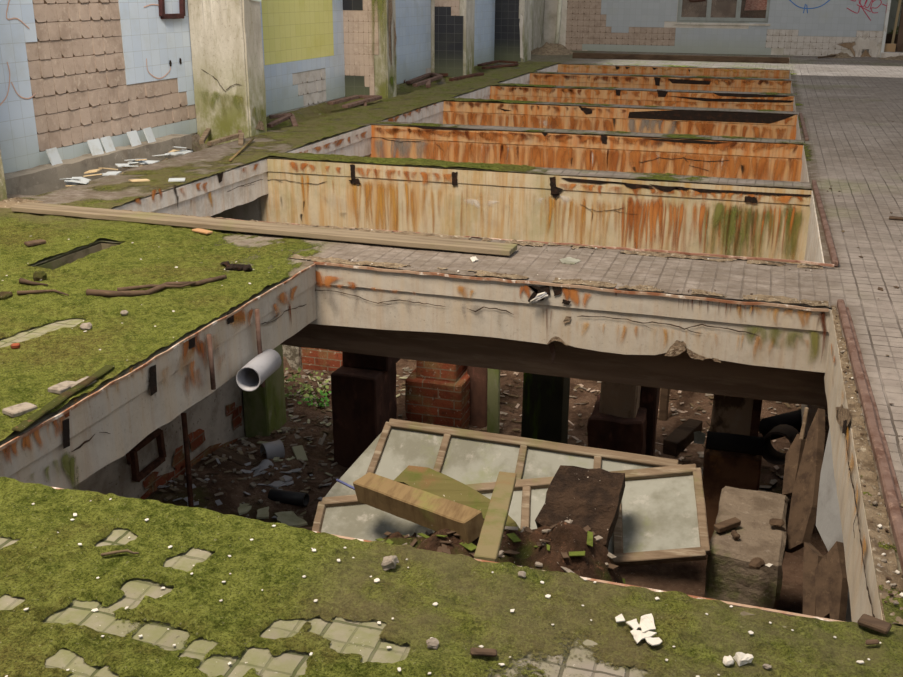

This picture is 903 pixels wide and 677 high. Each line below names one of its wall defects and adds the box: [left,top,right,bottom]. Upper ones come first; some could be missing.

peeling [565,0,676,50]
peeling [765,29,883,57]
peeling [25,0,196,152]
rust [377,65,797,181]
rust [290,132,366,198]
spalling [111,64,824,264]
rust [353,168,452,231]
leakage [713,203,769,255]
leakage [779,206,802,250]
crack [262,290,445,324]
rust [791,309,835,362]
spalling [0,260,883,622]